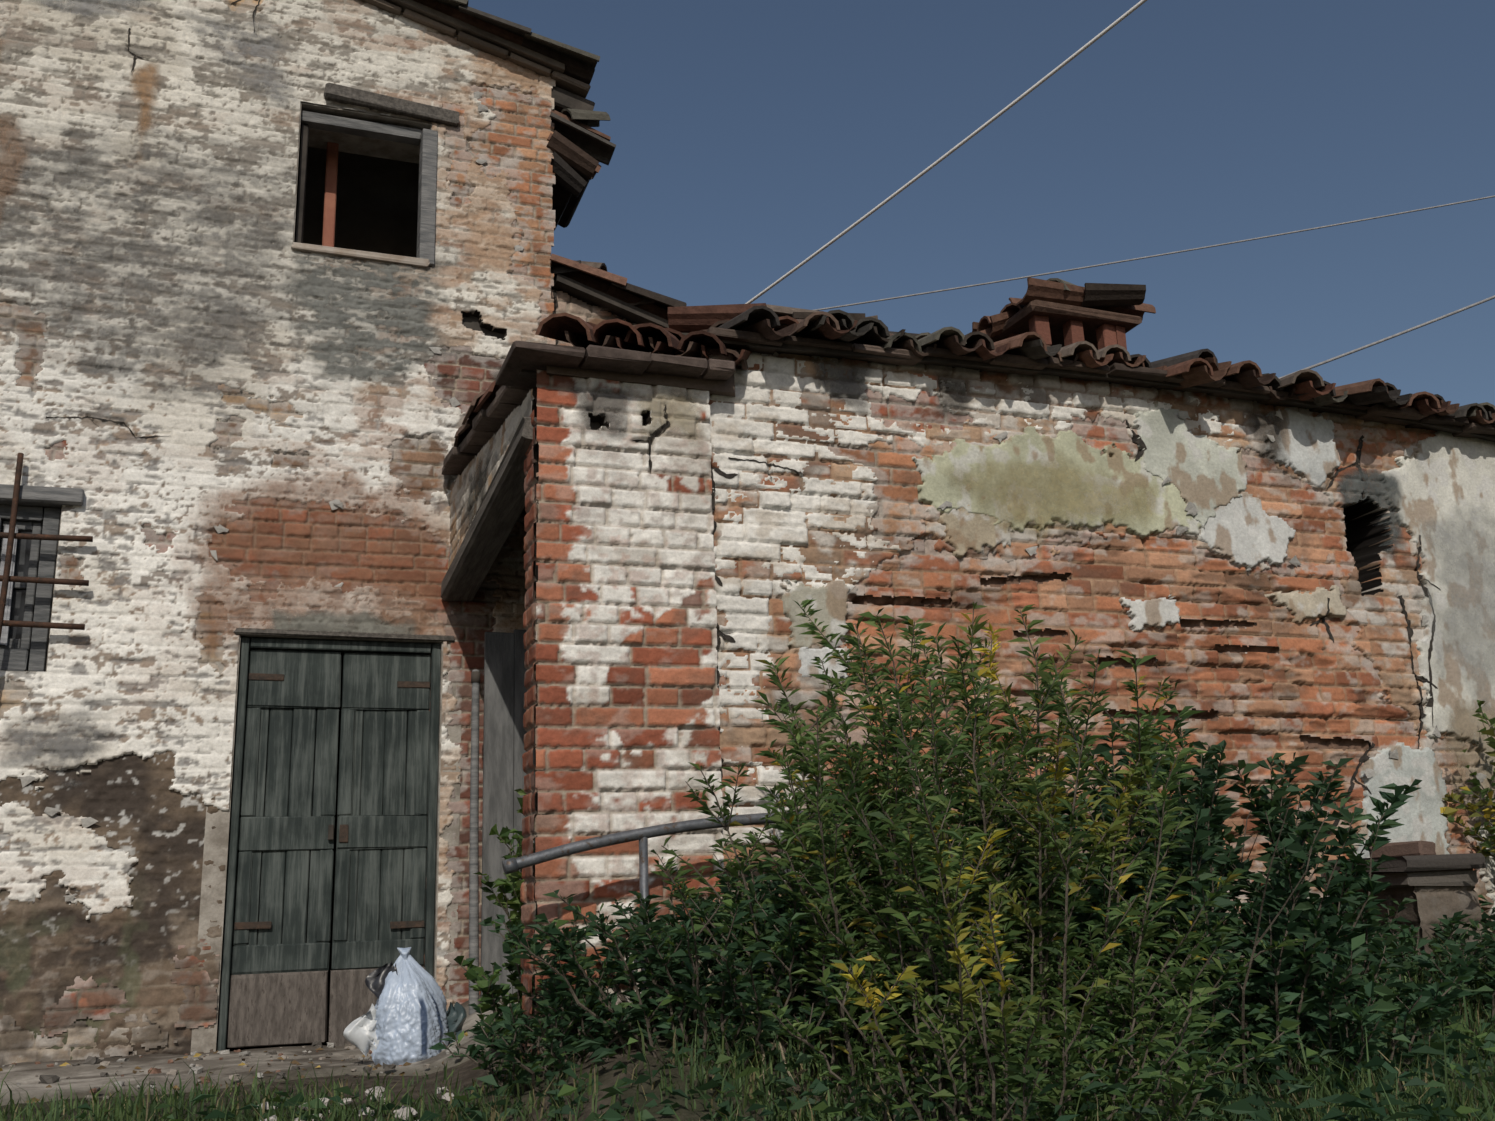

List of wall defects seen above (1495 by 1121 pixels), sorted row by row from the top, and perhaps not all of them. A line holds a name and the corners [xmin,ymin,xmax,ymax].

spalling [442,83,556,344]
spalling [209,384,303,454]
spalling [424,345,505,420]
spalling [641,410,651,426]
crack [633,405,671,473]
water stain [967,464,1153,527]
spalling [780,389,1495,921]
crack [1310,597,1334,643]
crack [1398,535,1440,749]
spalling [208,433,501,1004]
crack [1323,742,1375,842]
peeling [0,750,225,1065]